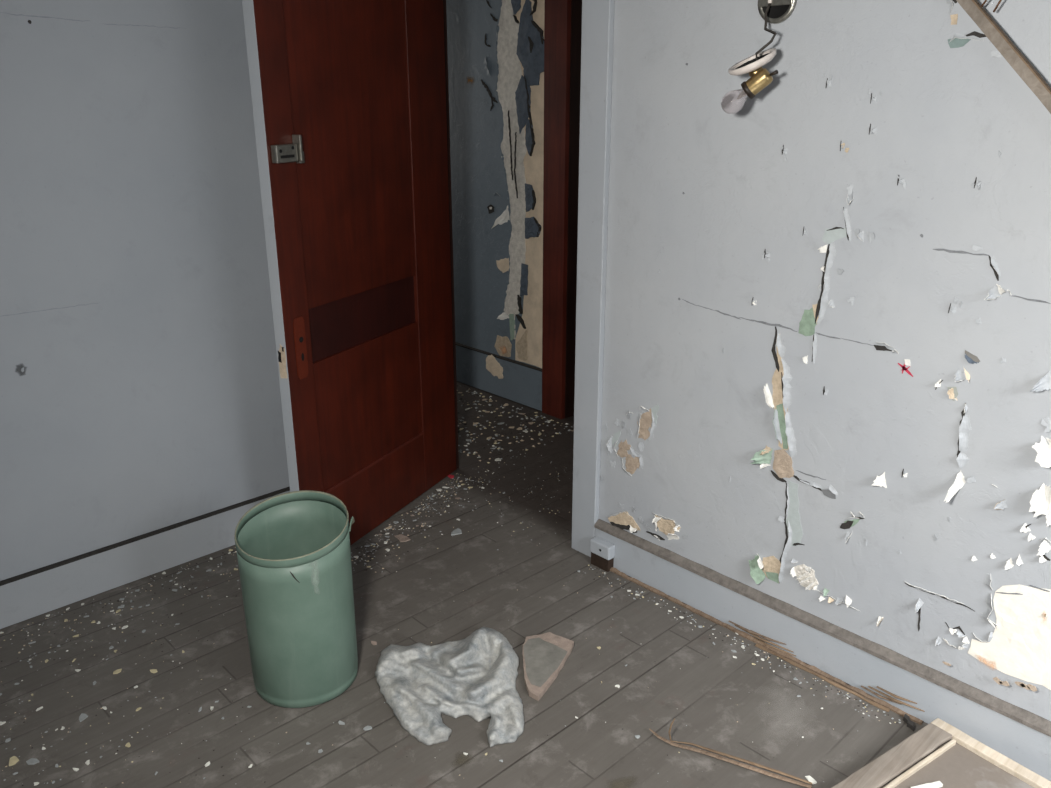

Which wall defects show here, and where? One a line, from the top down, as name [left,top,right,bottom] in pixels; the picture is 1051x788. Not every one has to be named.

peeling [486,0,545,379]
peeling [798,183,875,364]
crack [933,245,1051,304]
crack [684,300,874,346]
peeling [874,342,911,366]
peeling [750,326,797,482]
peeling [934,350,981,503]
peeling [1032,417,1051,468]
peeling [606,503,688,541]
peeling [1020,483,1051,563]
peeling [749,554,860,612]
spalling [935,574,1051,692]